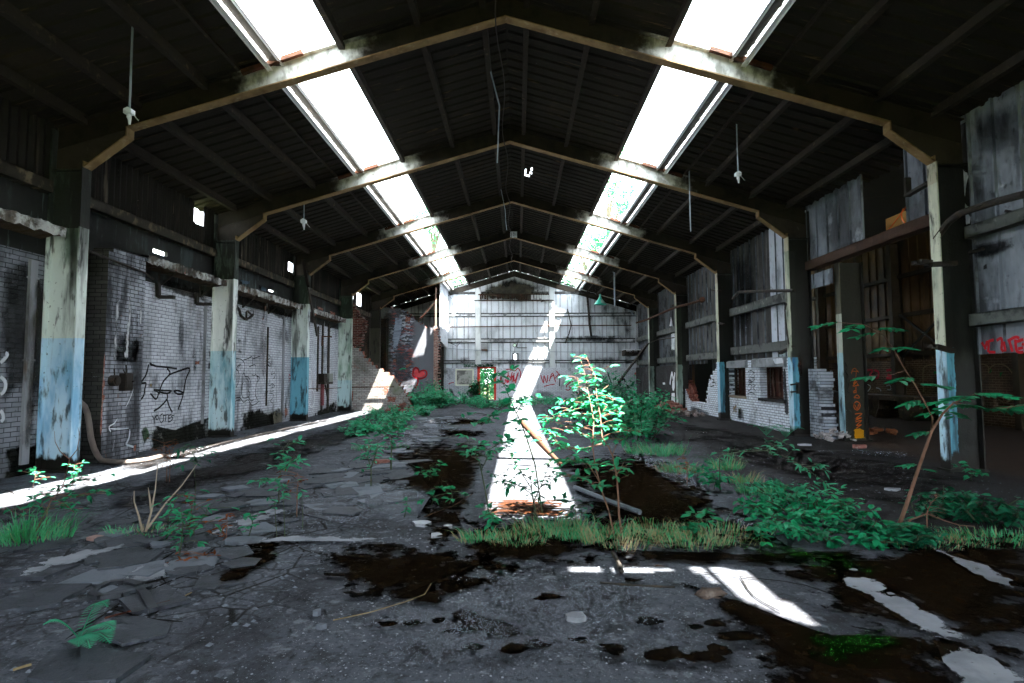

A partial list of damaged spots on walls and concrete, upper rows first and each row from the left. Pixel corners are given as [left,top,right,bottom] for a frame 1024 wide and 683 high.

water stain [142,418,209,450]
crack [152,552,186,589]
crack [66,604,183,639]